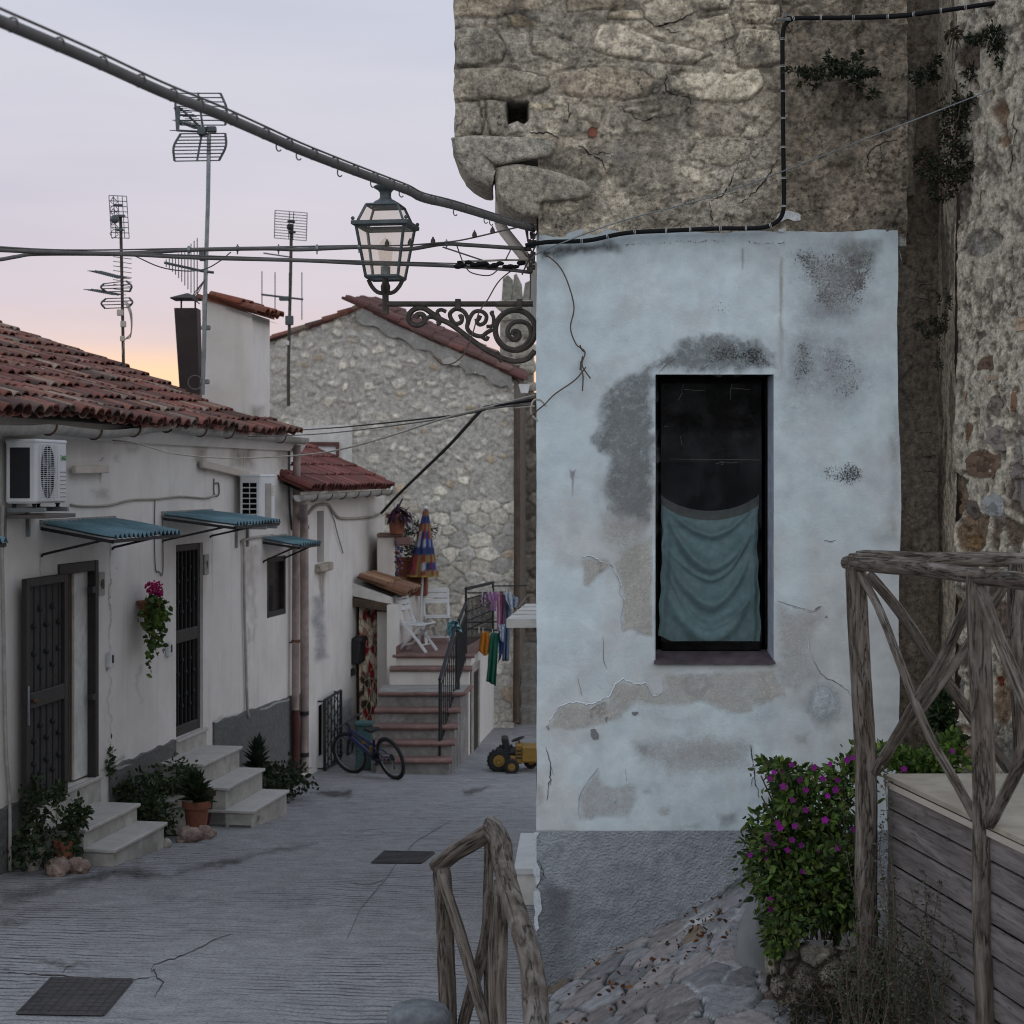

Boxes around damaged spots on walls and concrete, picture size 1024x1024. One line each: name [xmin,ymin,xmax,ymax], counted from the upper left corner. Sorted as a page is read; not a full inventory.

crack [635,74,691,122]
crack [529,102,615,170]
damp [795,247,873,313]
damp [599,335,770,517]
damp [824,462,862,485]
peeling [584,539,652,634]
spalling [590,702,608,740]
crack [133,934,230,997]